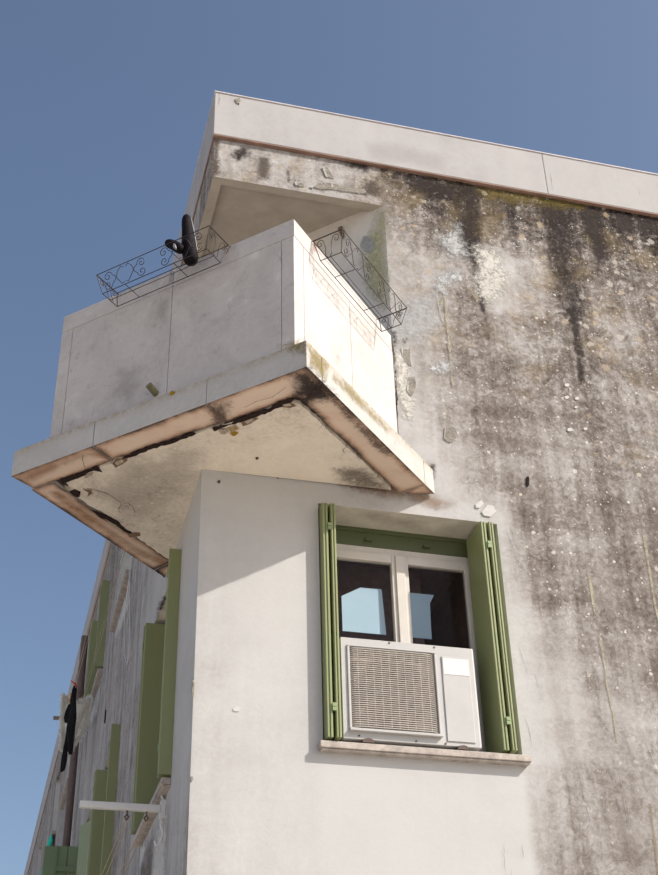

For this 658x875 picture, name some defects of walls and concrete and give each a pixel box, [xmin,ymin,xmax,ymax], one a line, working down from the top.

damp [259,157,270,178]
damp [406,175,486,312]
damp [537,197,658,381]
flaking render [212,397,297,435]
damp [292,368,389,455]
flaking render [111,432,196,468]
flaking render [60,466,102,497]
flaking render [92,510,140,537]
damp [138,848,153,875]